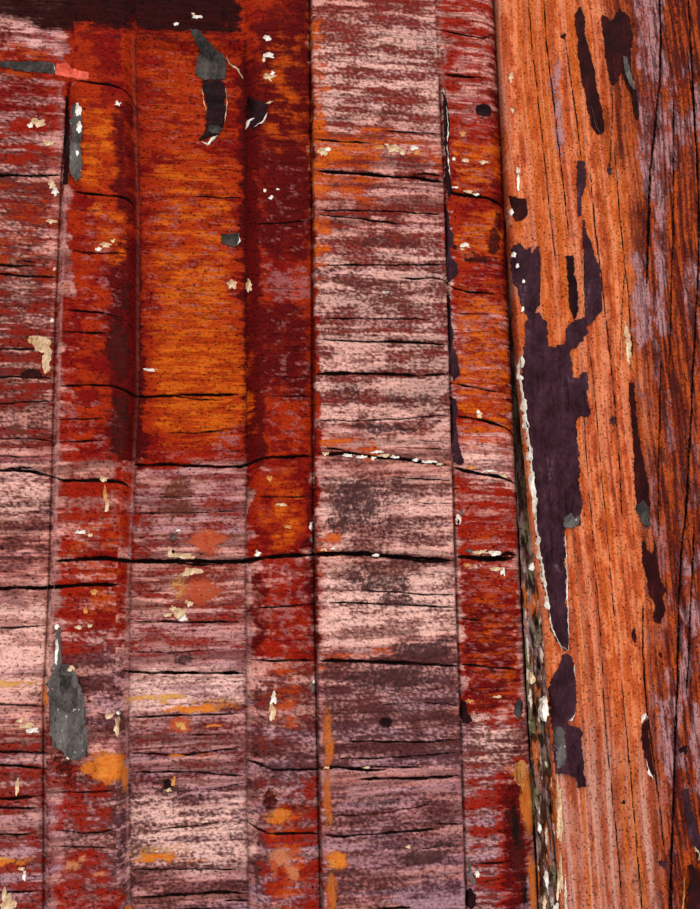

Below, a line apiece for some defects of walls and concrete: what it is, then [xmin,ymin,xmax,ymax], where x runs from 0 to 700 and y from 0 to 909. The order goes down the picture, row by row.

peeling [55,62,89,80]
peeling [69,103,83,181]
peeling [189,12,243,145]
peeling [574,7,605,134]
peeling [601,9,639,120]
crack [0,376,514,514]
crack [263,371,496,397]
peeling [508,160,603,788]
crack [528,0,700,909]
crack [0,551,516,591]
peeling [16,624,89,761]
peeling [682,788,700,909]